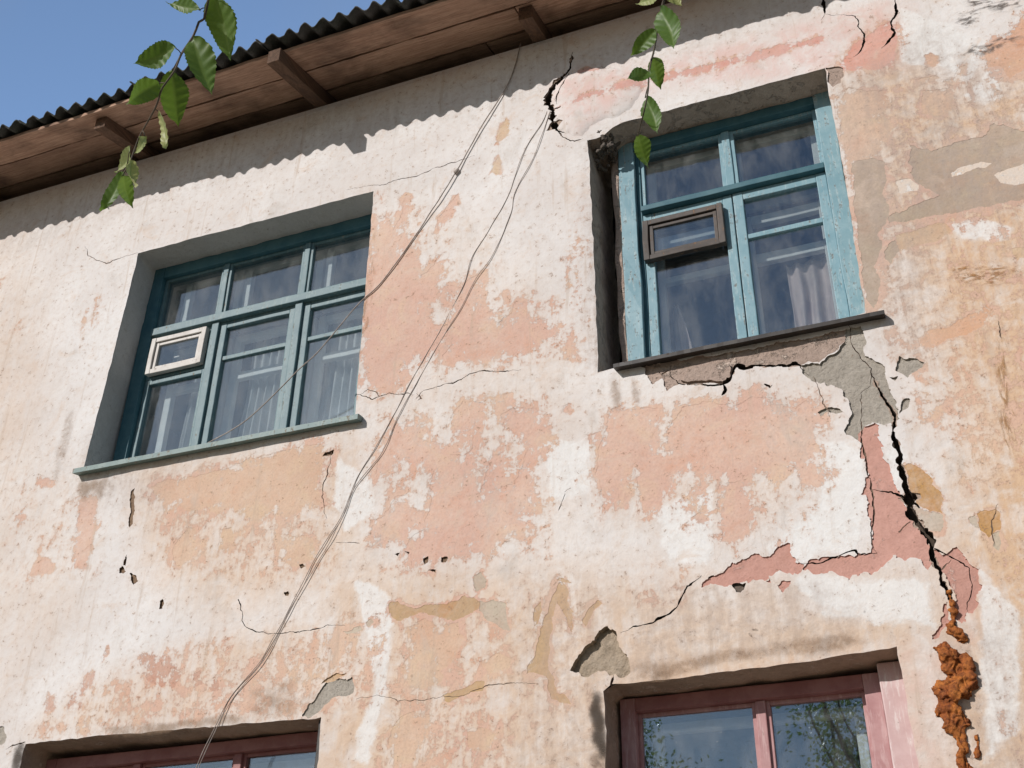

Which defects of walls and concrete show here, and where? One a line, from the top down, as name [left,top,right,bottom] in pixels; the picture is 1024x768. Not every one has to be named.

crack [821,0,898,57]
crack [543,52,581,142]
spalling [826,15,1024,308]
crack [357,370,519,400]
crack [659,361,830,417]
peeling [595,305,995,639]
crack [801,326,973,625]
crack [238,599,333,634]
peeling [527,578,602,704]
spalling [570,626,631,678]
crack [621,575,714,633]
spalling [302,673,354,718]